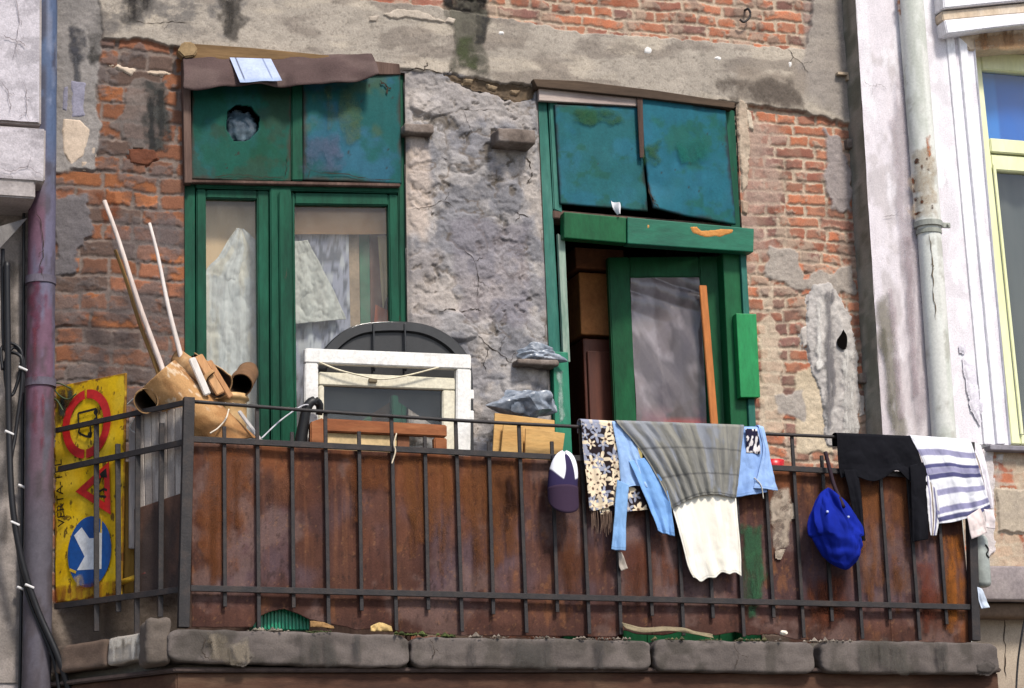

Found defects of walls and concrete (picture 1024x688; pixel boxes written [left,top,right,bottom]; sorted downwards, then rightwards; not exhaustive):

leakage [69,27,100,81]
leakage [218,0,244,40]
leakage [444,0,489,74]
peeling [62,81,96,171]
spalling [126,146,160,168]
flaking render [735,99,754,215]
flaking render [798,282,865,448]
rust [191,443,971,643]